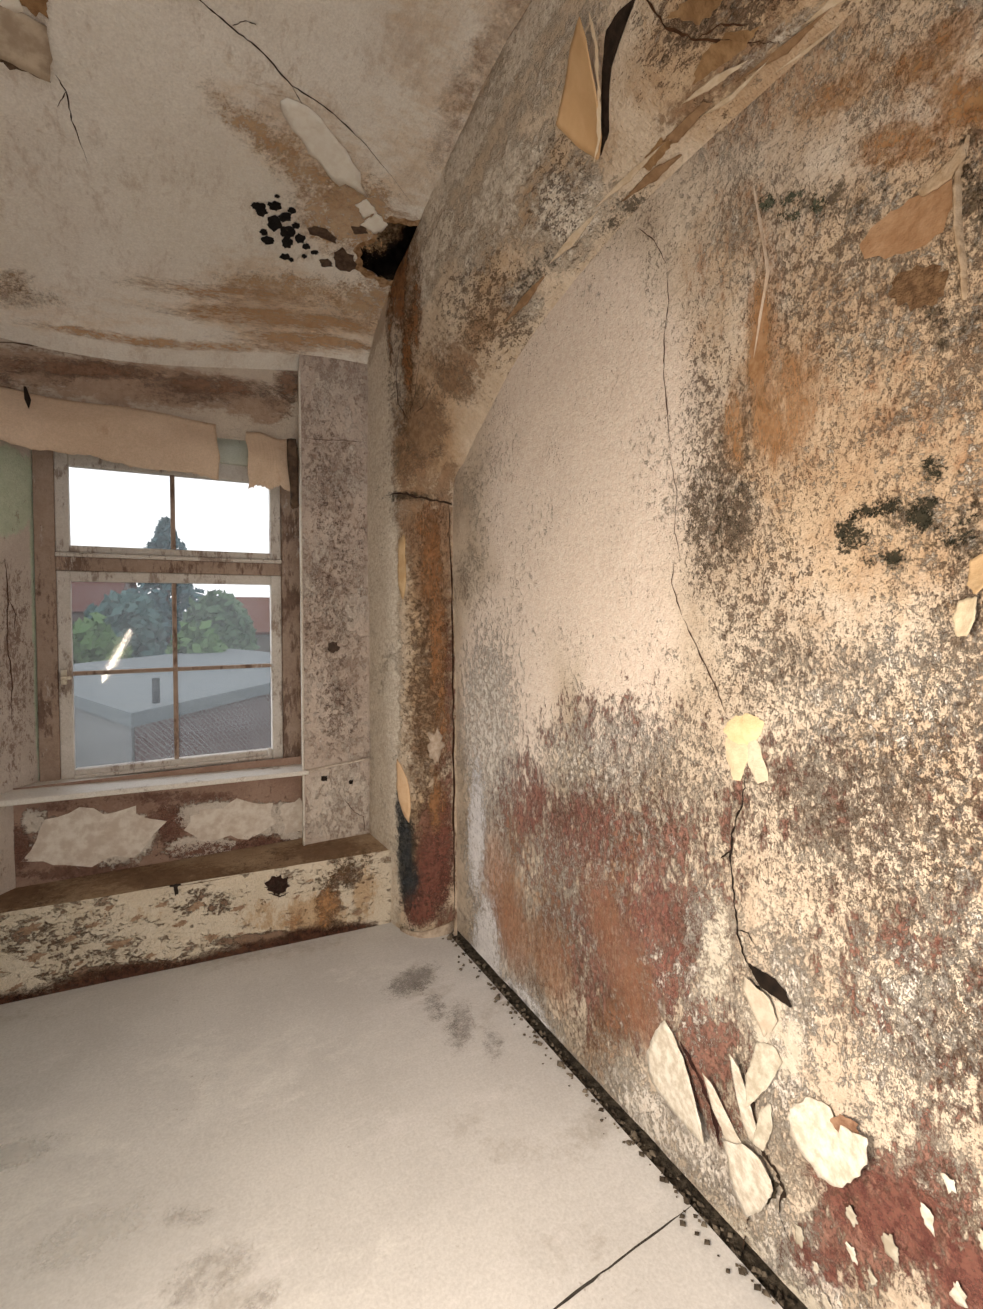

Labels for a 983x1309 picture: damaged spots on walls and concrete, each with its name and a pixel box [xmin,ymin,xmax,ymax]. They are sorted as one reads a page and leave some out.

crack [646,0,776,44]
crack [56,76,88,163]
crack [199,0,407,197]
water stain [217,94,390,321]
water stain [833,451,980,570]
peeling [952,553,983,637]
peeling [21,806,167,867]
water stain [464,750,555,1036]
crack [720,777,757,966]
peeling [646,976,868,1217]
water stain [706,1197,823,1309]
peeling [920,1202,935,1237]